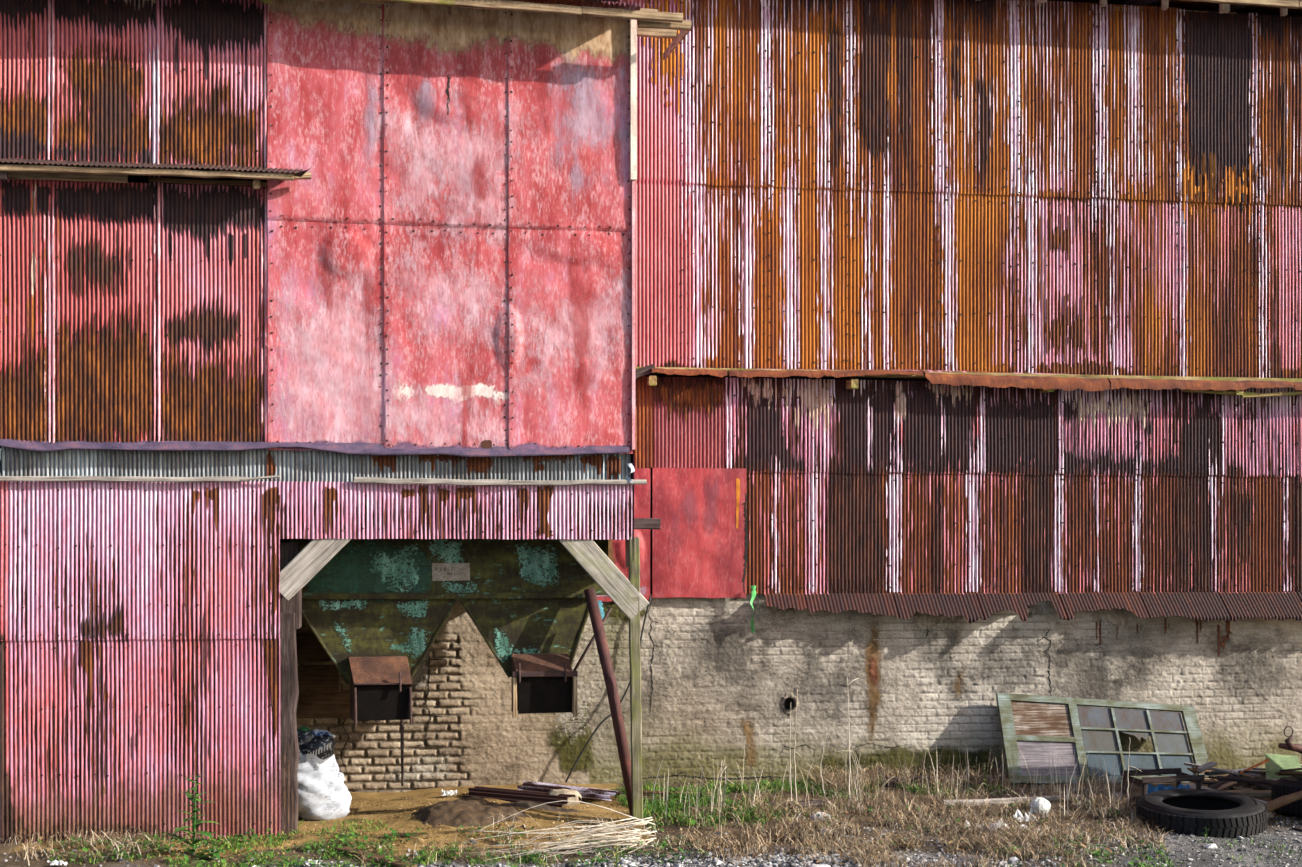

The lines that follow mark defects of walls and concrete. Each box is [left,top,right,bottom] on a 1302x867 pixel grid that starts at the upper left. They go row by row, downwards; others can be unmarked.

water stain [269,0,630,62]
rust [1177,10,1302,225]
rust [0,0,280,614]
peeling [392,381,510,407]
rust [401,440,492,532]
rust [517,454,622,537]
rust [825,381,1219,592]
rust [79,600,128,708]
peeling [306,539,479,659]
peeling [494,628,540,662]
peeling [513,543,559,586]
crack [1039,622,1053,696]